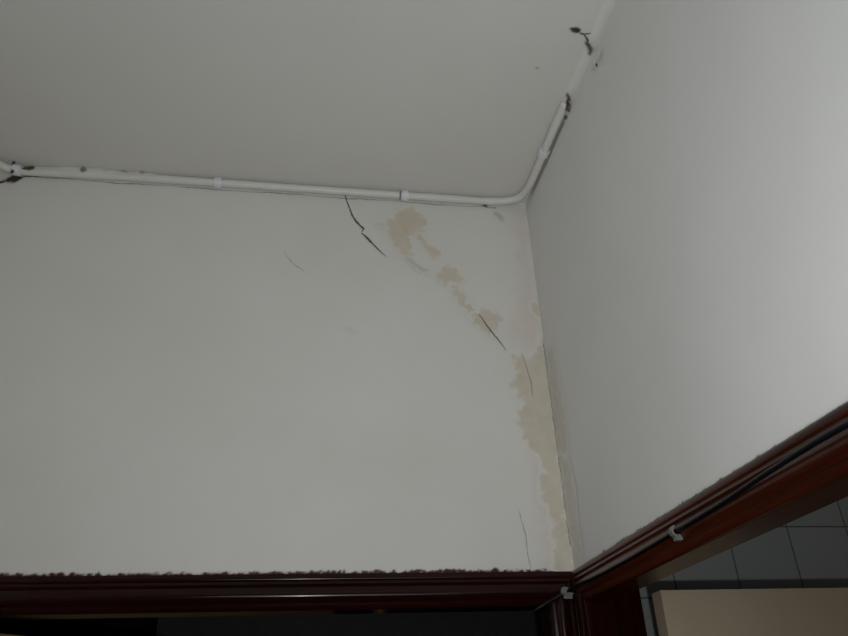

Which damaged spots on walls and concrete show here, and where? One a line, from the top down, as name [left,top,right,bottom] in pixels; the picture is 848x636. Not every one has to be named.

spalling [571,28,604,73]
crack [0,161,33,183]
crack [345,195,384,255]
damp [491,203,584,572]